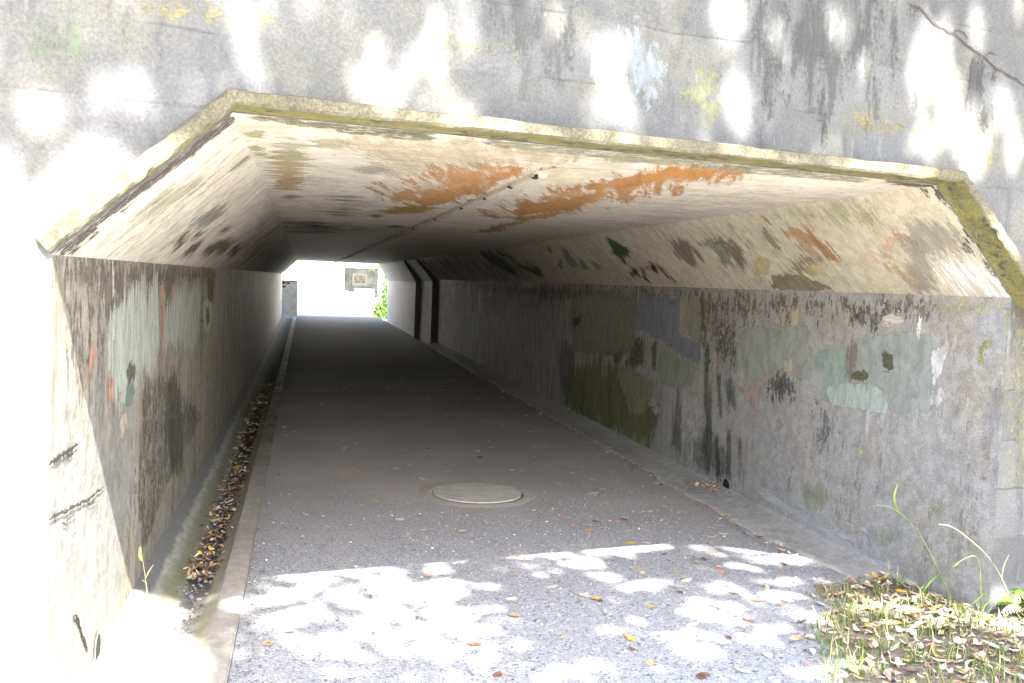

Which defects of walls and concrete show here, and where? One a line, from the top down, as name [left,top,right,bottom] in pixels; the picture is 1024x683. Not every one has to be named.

water stain [753,0,898,142]
water stain [958,50,994,135]
corrosion [367,161,752,234]
crack [48,442,80,466]
water stain [696,344,742,481]
crack [49,486,105,526]